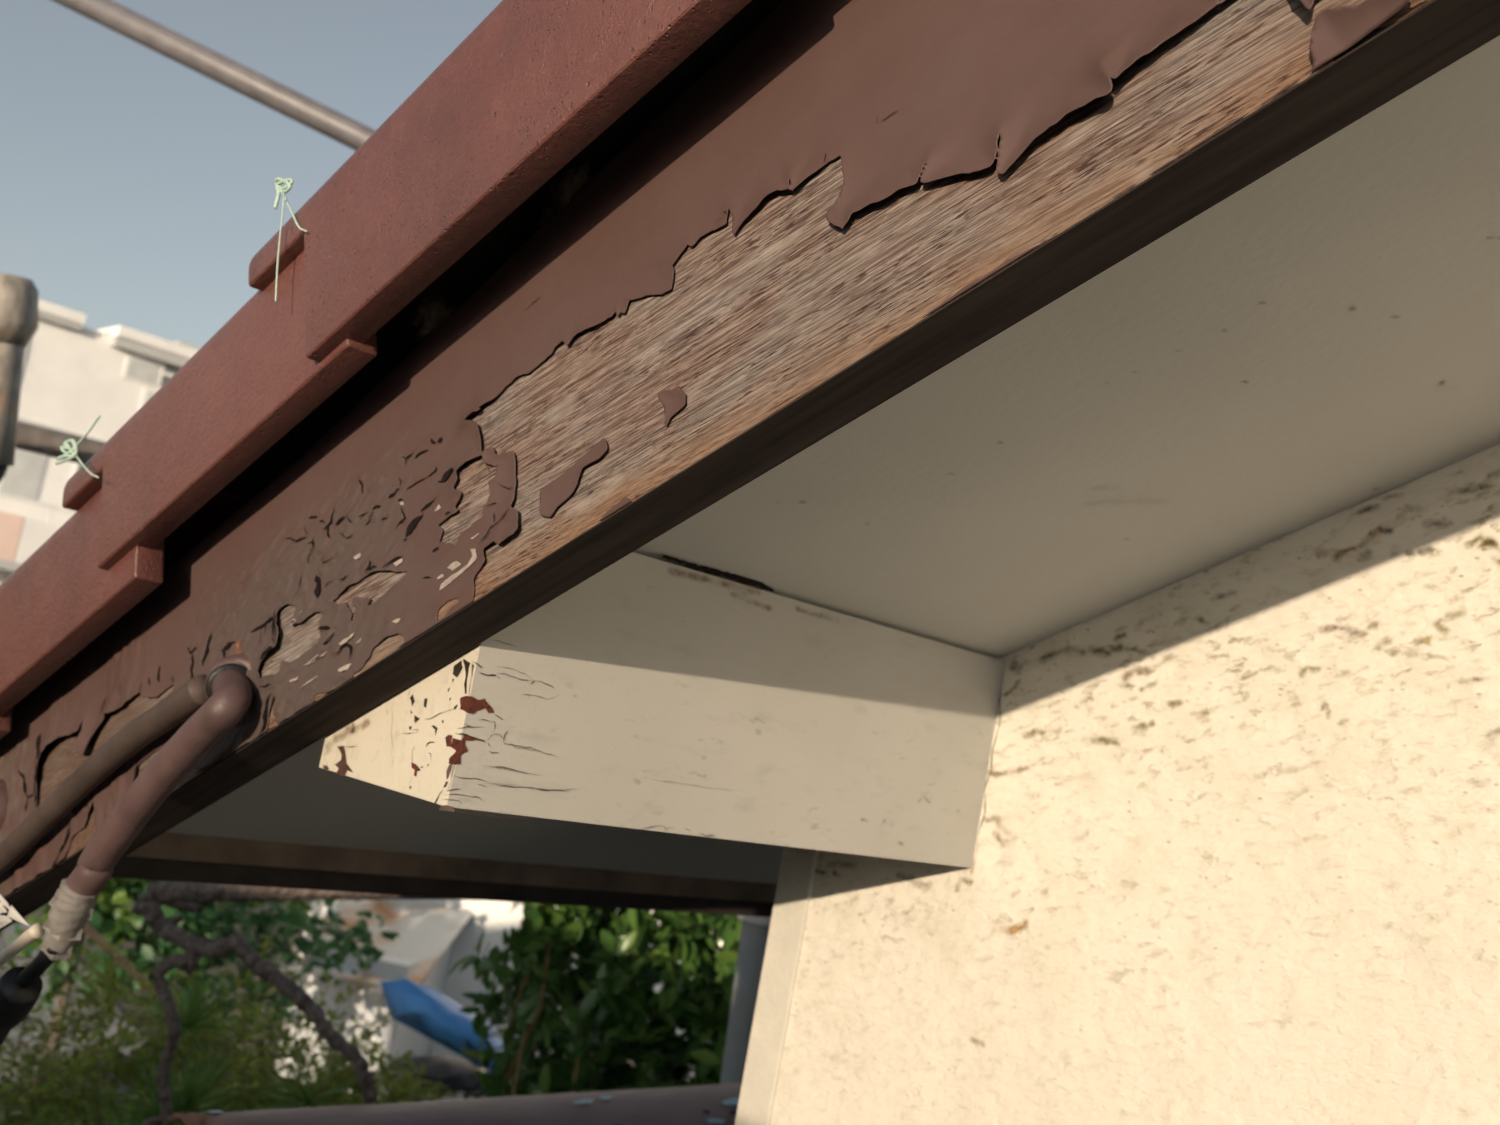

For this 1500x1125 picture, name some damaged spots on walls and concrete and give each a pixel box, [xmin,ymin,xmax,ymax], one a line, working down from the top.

peeling [433,0,1431,627]
peeling [258,558,413,703]
leakage [1082,633,1137,655]
peeling [37,685,173,807]
peeling [263,696,285,734]
peeling [322,746,352,776]
peeling [409,659,494,787]
crack [391,640,569,819]